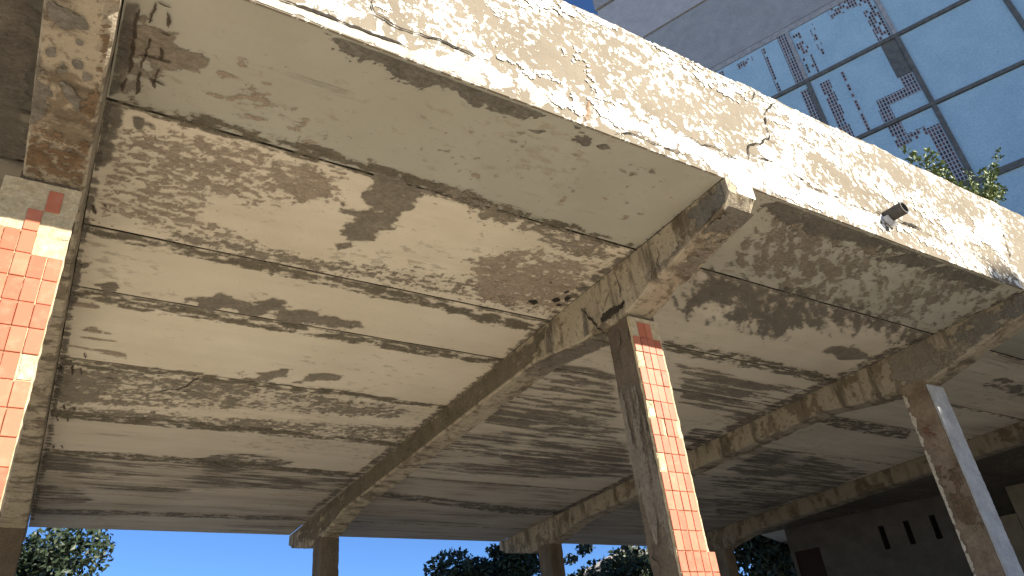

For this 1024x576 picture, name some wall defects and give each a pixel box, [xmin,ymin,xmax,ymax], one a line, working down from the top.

water stain [31,4,674,553]
peeling [92,15,625,316]
crack [581,274,631,368]
peeling [256,0,1024,369]
crack [621,85,1012,261]